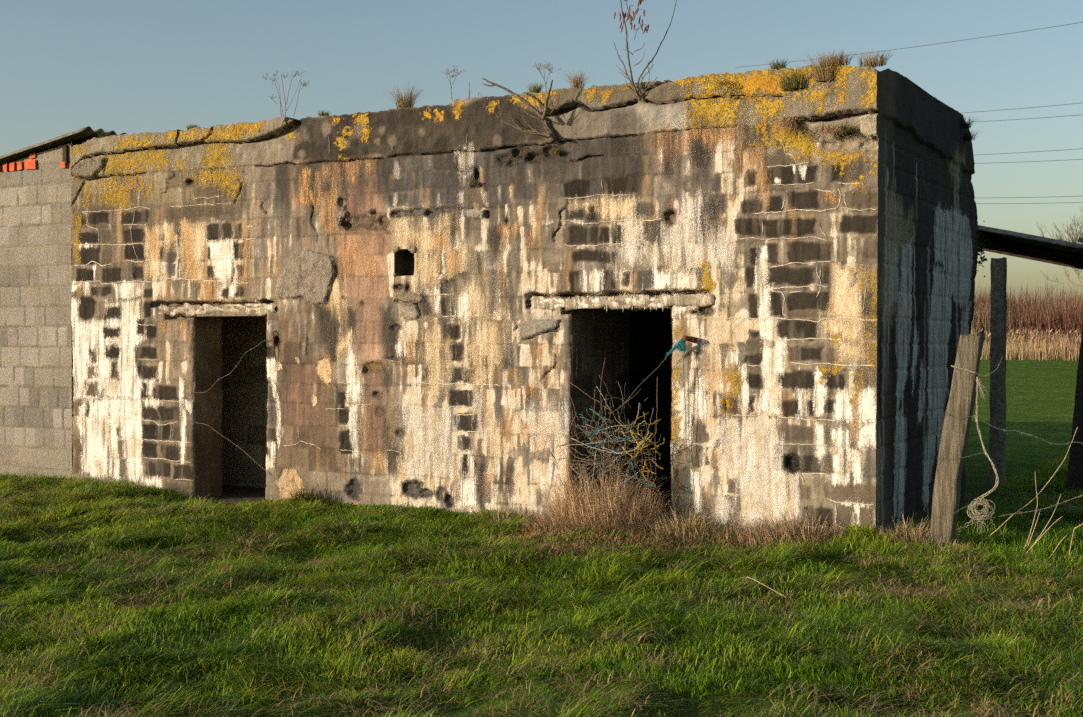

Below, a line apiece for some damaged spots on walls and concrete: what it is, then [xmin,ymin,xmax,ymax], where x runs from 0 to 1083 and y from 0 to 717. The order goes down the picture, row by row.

crack [71,81,879,381]
leakage [71,218,236,489]
leakage [670,370,708,455]
leakage [716,245,800,528]
leakage [797,366,877,486]
leakage [817,262,869,362]
leakage [893,206,973,522]
peeling [276,468,303,499]
spalling [344,479,360,500]
spalling [401,479,454,508]
leakage [691,470,702,514]
leakage [841,501,865,529]